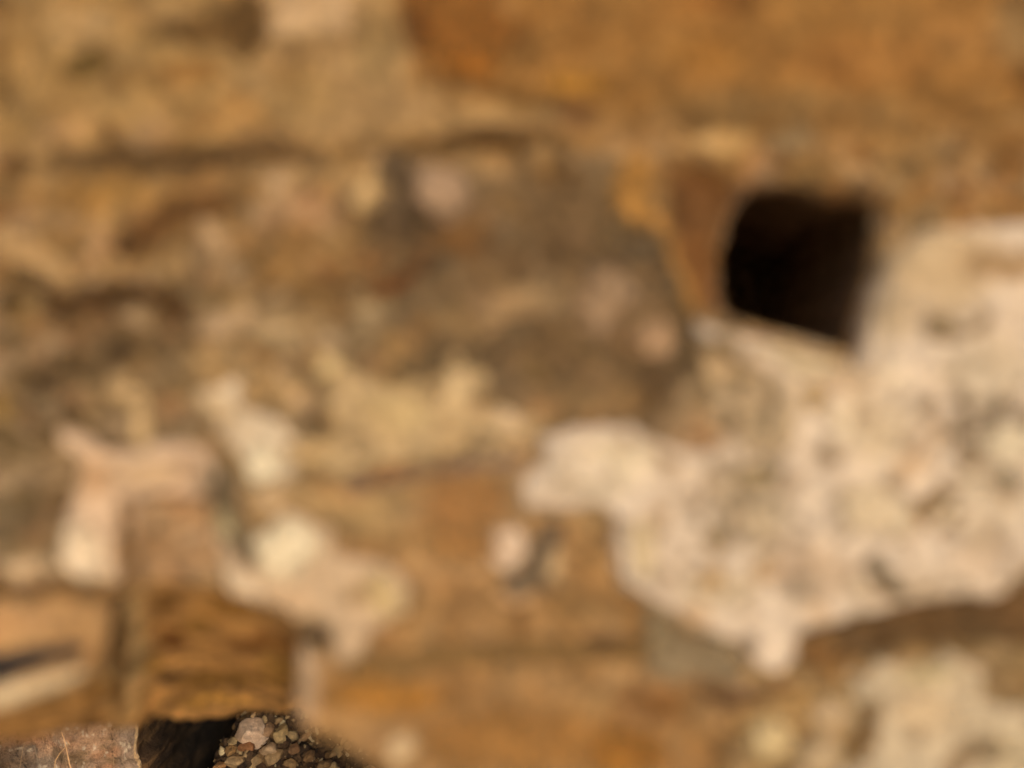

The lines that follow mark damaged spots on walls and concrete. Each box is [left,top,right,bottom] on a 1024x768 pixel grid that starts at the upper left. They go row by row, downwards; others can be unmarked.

spalling [352,166,378,214]
spalling [0,223,77,286]
peeling [194,223,1024,672]
peeling [58,375,216,584]
spalling [0,668,89,709]